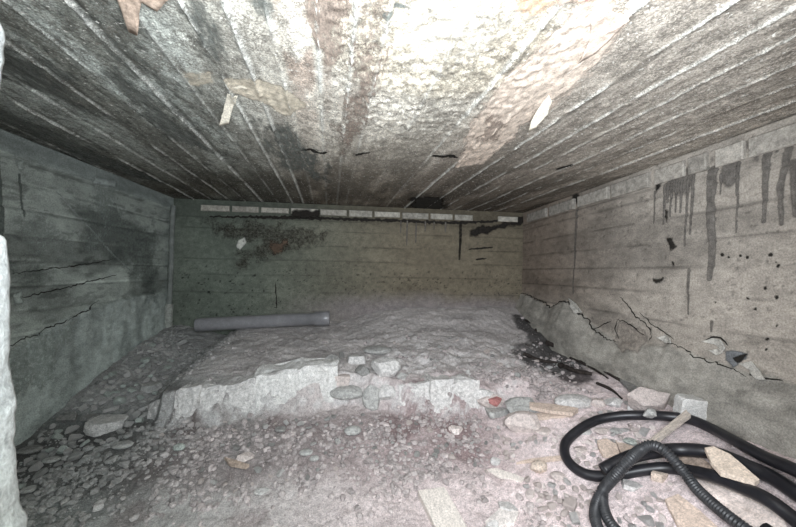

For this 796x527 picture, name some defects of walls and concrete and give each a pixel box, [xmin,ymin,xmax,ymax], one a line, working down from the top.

crack [13,259,116,299]
water stain [0,104,166,295]
water stain [206,219,325,268]
water stain [653,168,695,246]
water stain [706,162,741,281]
water stain [754,146,796,226]
water stain [9,320,76,394]
crack [10,302,96,346]